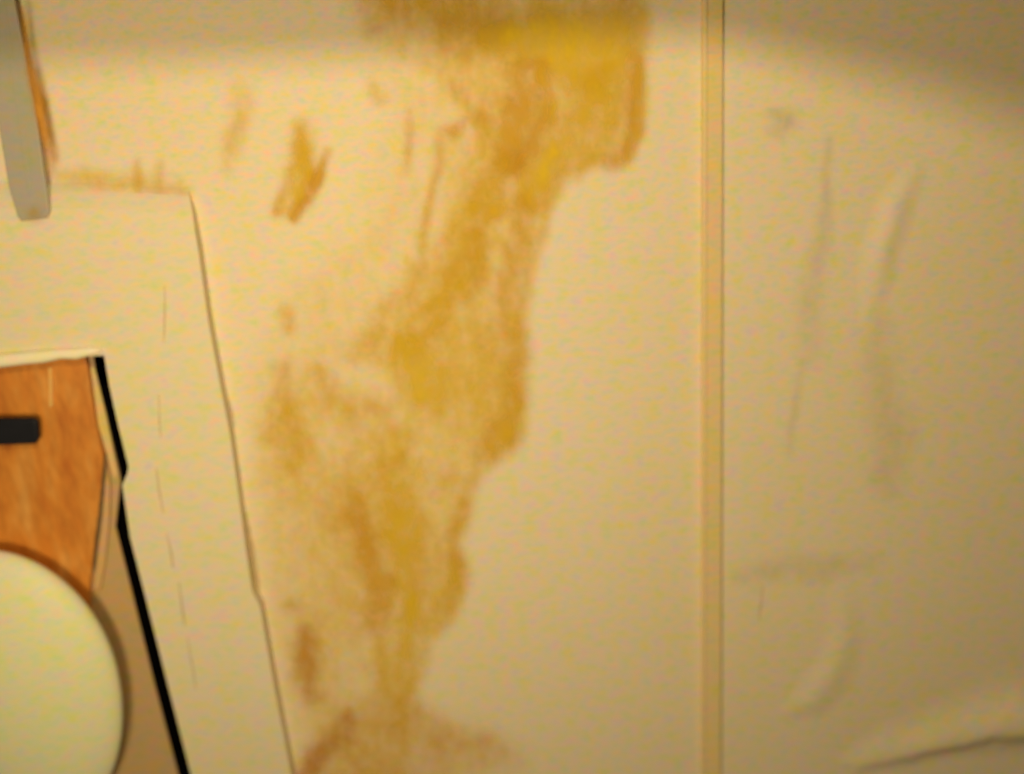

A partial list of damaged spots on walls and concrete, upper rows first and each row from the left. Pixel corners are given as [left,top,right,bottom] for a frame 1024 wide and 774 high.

damp [444,12,629,124]
damp [290,146,323,217]
damp [501,94,564,209]